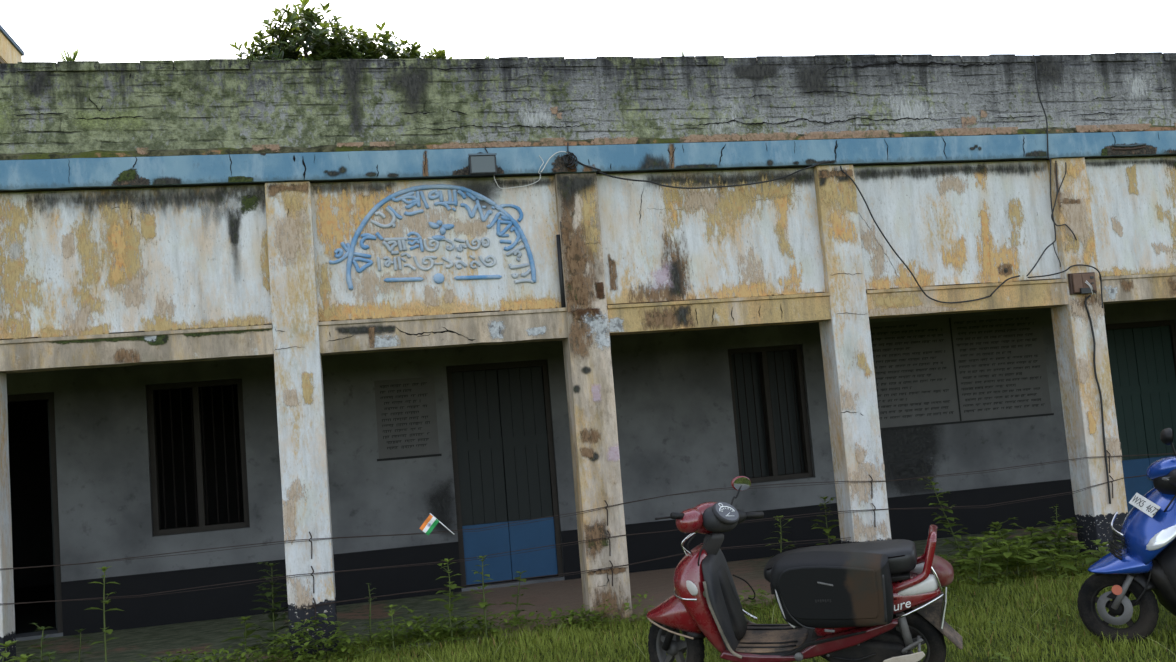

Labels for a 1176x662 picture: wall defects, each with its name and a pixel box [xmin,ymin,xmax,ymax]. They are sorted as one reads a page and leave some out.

damp [342,59,361,132]
damp [733,64,777,78]
damp [892,101,928,122]
flaking render [1075,124,1176,195]
damp [1085,160,1176,207]
peeling [0,168,270,341]
damp [29,185,266,257]
peeling [260,183,489,321]
peeling [672,176,814,299]
peeling [818,169,1025,290]
peeling [1065,204,1176,277]
crack [396,326,500,341]